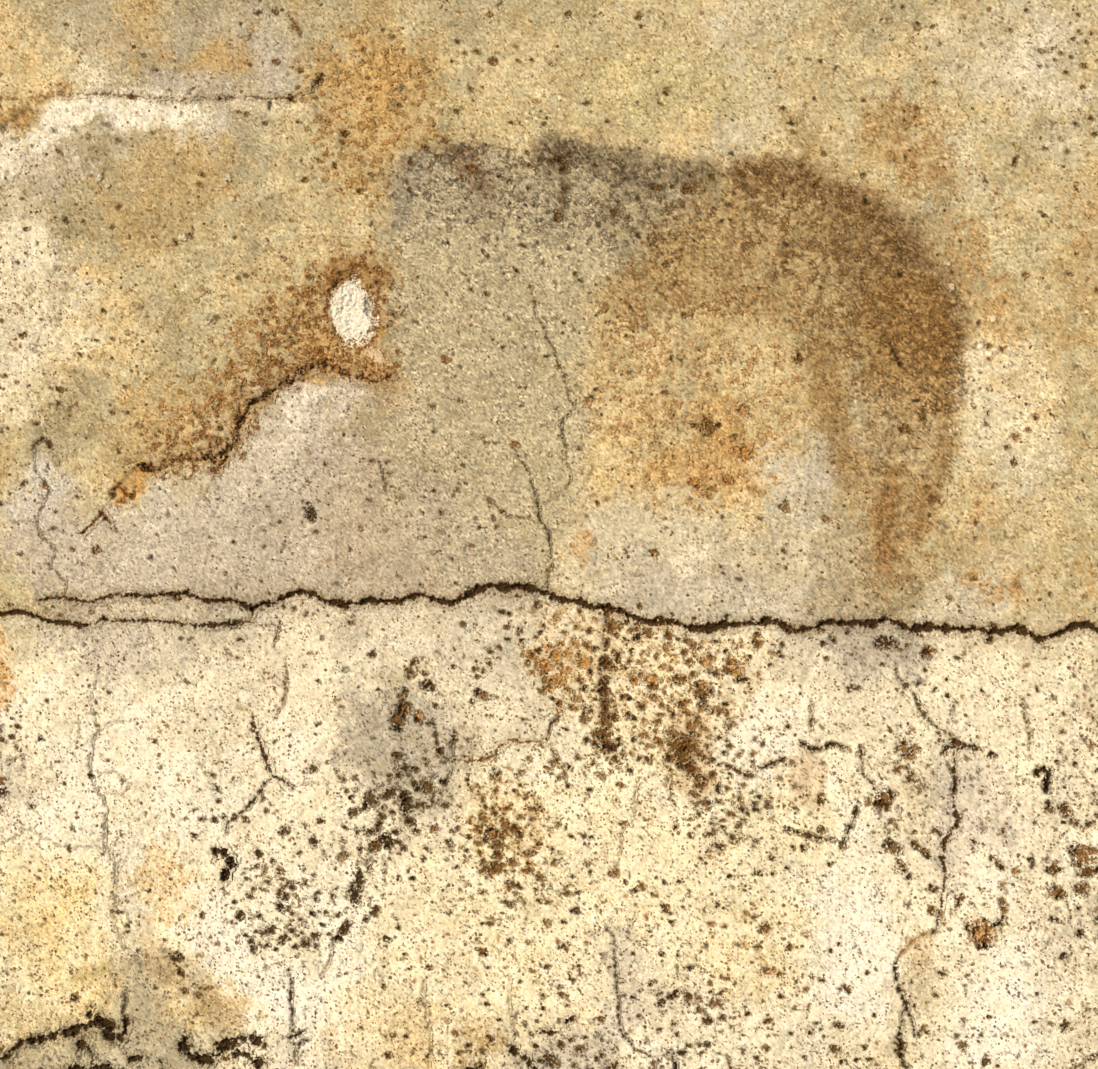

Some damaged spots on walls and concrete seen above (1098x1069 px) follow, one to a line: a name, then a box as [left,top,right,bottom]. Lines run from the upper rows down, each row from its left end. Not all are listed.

flaking render [0,365,384,618]
rust [107,234,418,511]
spalling [314,257,397,381]
water stain [318,26,1081,693]
crack [0,271,1098,1069]
rust [512,600,787,810]